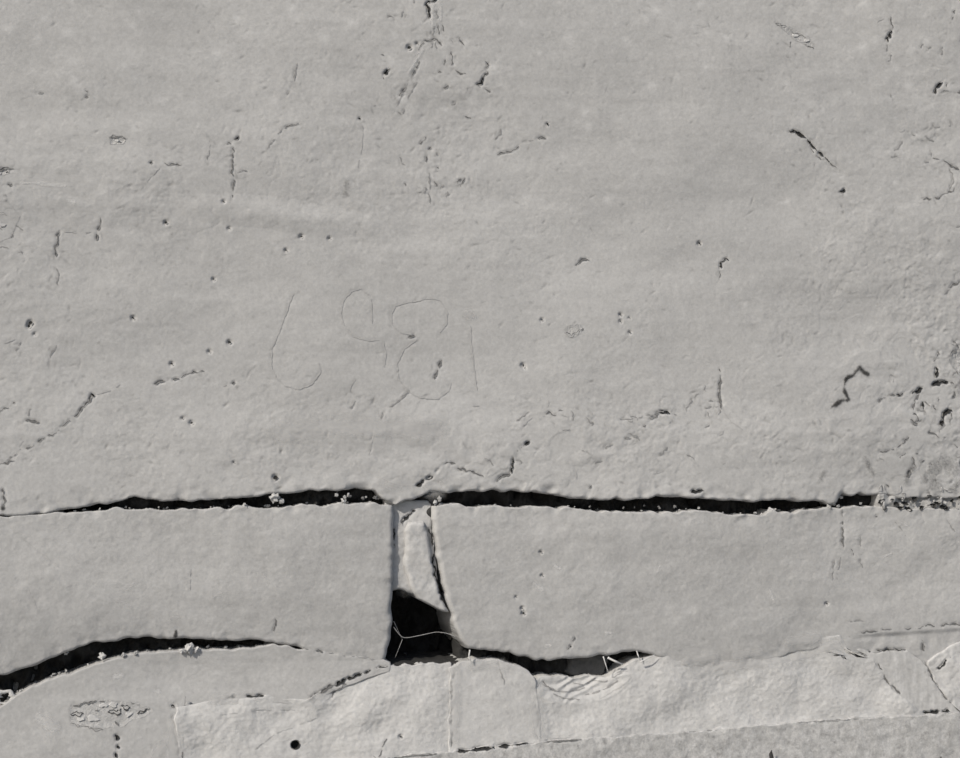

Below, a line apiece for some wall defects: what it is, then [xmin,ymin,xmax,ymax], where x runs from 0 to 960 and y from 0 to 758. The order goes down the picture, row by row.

crack [387,0,491,118]
crack [790,130,836,167]
crack [416,400,594,487]
crack [575,369,743,489]
crack [393,510,447,607]
crack [831,510,863,581]
crack [222,649,381,749]
crack [448,674,456,746]
crack [850,619,960,694]
crack [923,657,951,714]